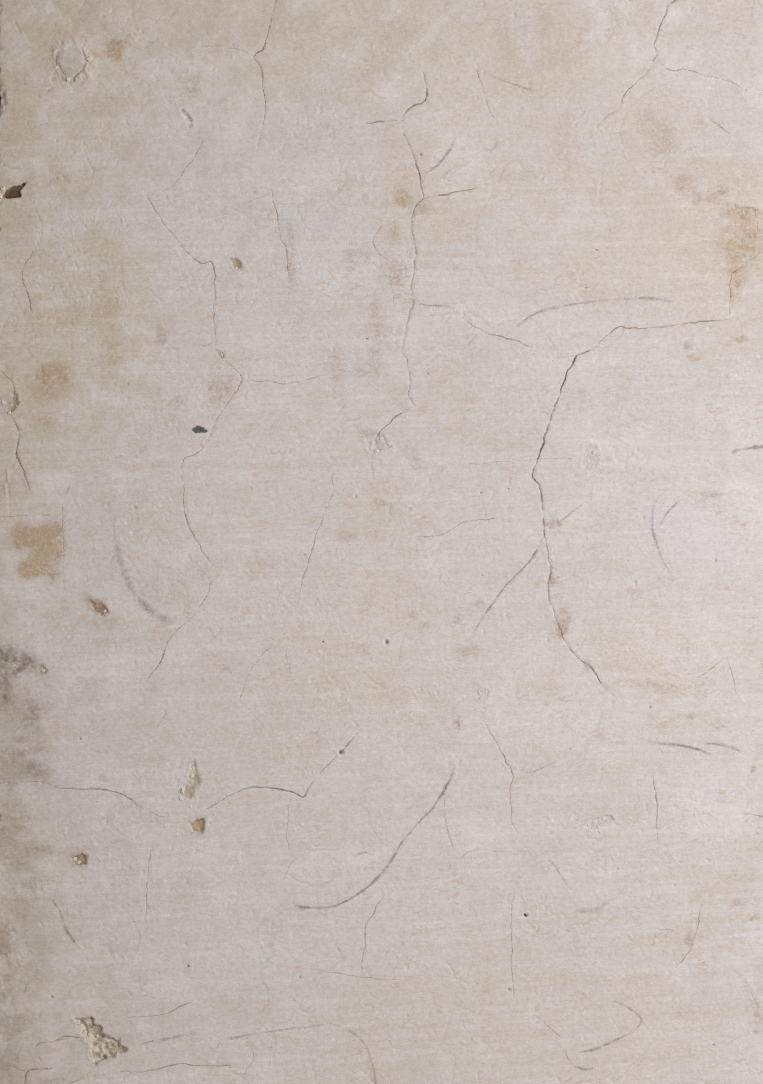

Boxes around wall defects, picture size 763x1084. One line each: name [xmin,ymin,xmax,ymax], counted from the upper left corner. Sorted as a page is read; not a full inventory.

flaking render [192,819,205,833]
flaking render [74,1018,126,1064]